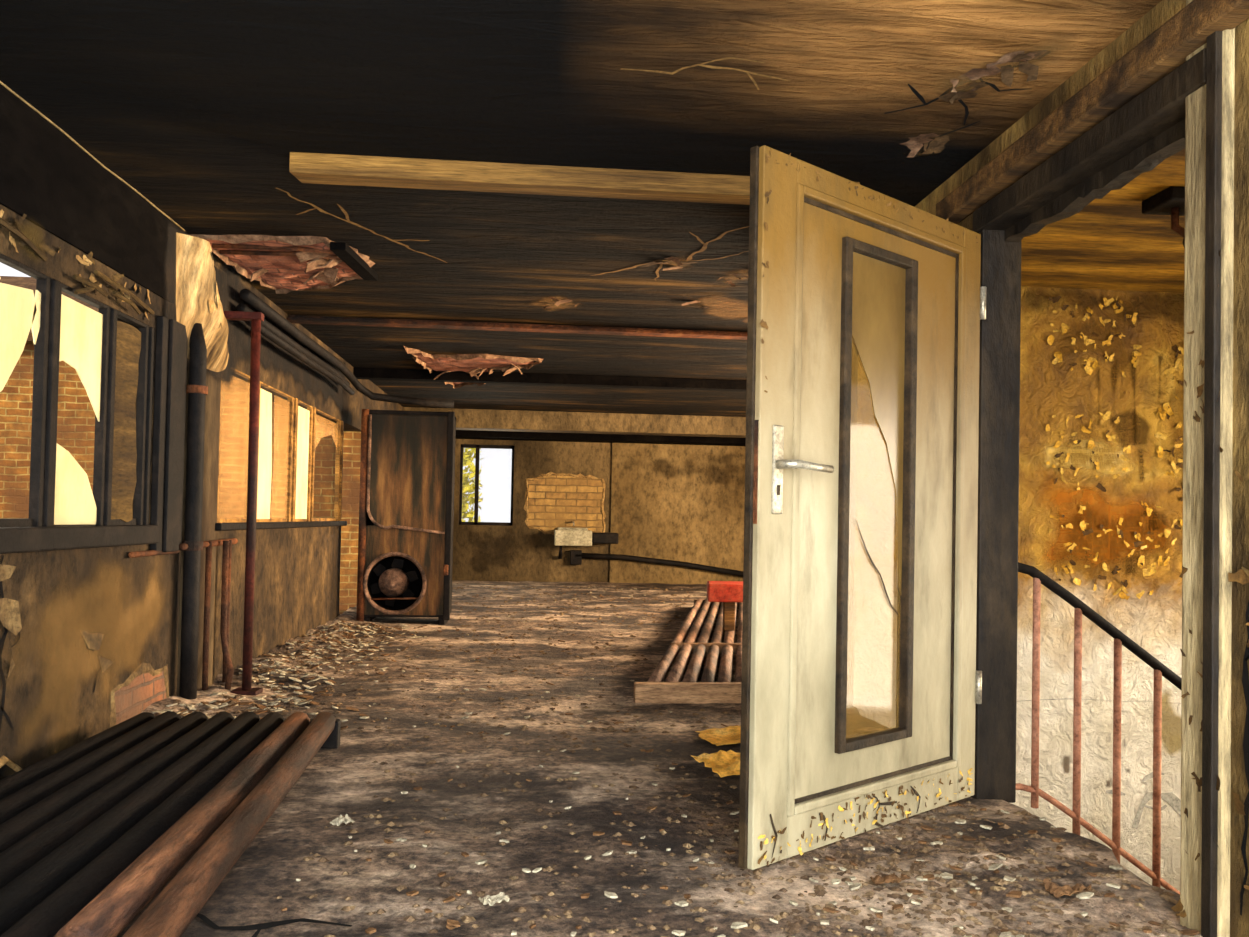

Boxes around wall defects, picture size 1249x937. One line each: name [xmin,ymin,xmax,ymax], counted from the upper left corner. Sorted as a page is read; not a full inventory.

crack [620,57,790,90]
spalling [189,234,378,294]
crack [276,188,447,263]
crack [591,226,749,281]
peeling [645,257,697,271]
peeling [532,297,581,309]
peeling [682,270,769,344]
spalling [404,346,543,389]
spalling [524,472,606,535]
crack [0,555,22,731]